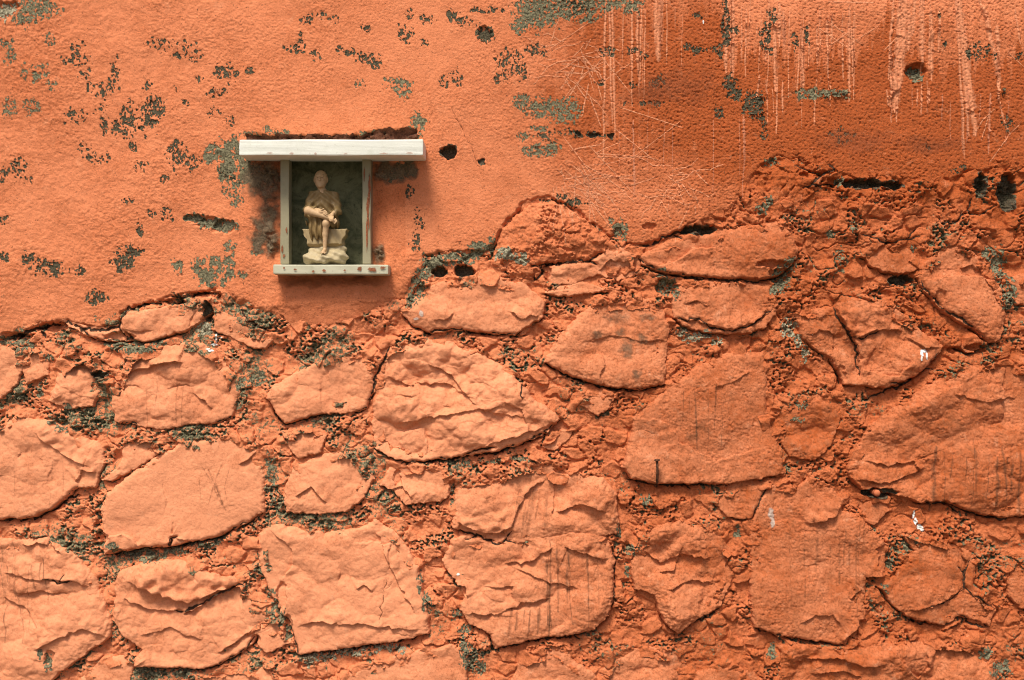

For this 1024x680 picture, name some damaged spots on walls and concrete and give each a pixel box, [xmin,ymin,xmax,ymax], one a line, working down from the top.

peeling [398,0,649,158]
water stain [724,0,1023,160]
peeling [0,250,86,278]
water stain [242,161,281,253]
spalling [108,61,430,289]
water stain [372,245,385,263]
water stain [374,152,418,184]
peeling [384,161,530,308]
peeling [105,540,222,564]
peeling [132,667,197,679]
peeling [296,643,410,669]
peeling [451,609,491,678]